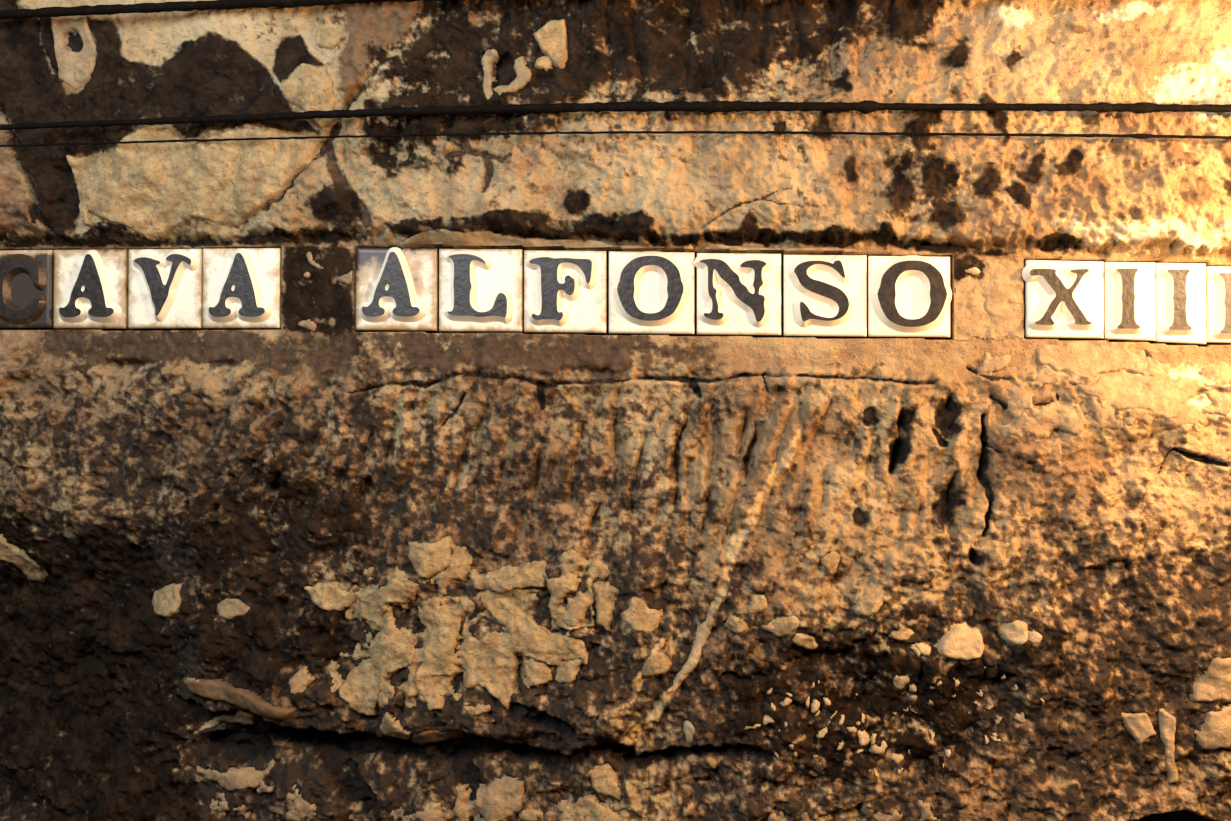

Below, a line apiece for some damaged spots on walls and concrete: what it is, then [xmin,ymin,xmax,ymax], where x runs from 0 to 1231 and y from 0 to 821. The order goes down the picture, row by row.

crack [185,700,773,821]